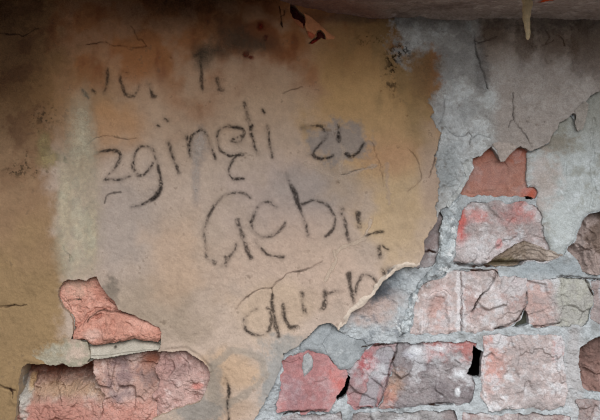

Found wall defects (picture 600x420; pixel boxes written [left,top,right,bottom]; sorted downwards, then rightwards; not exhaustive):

peeling [290,7,335,44]
flaking render [254,16,600,420]
flaking render [17,277,210,420]